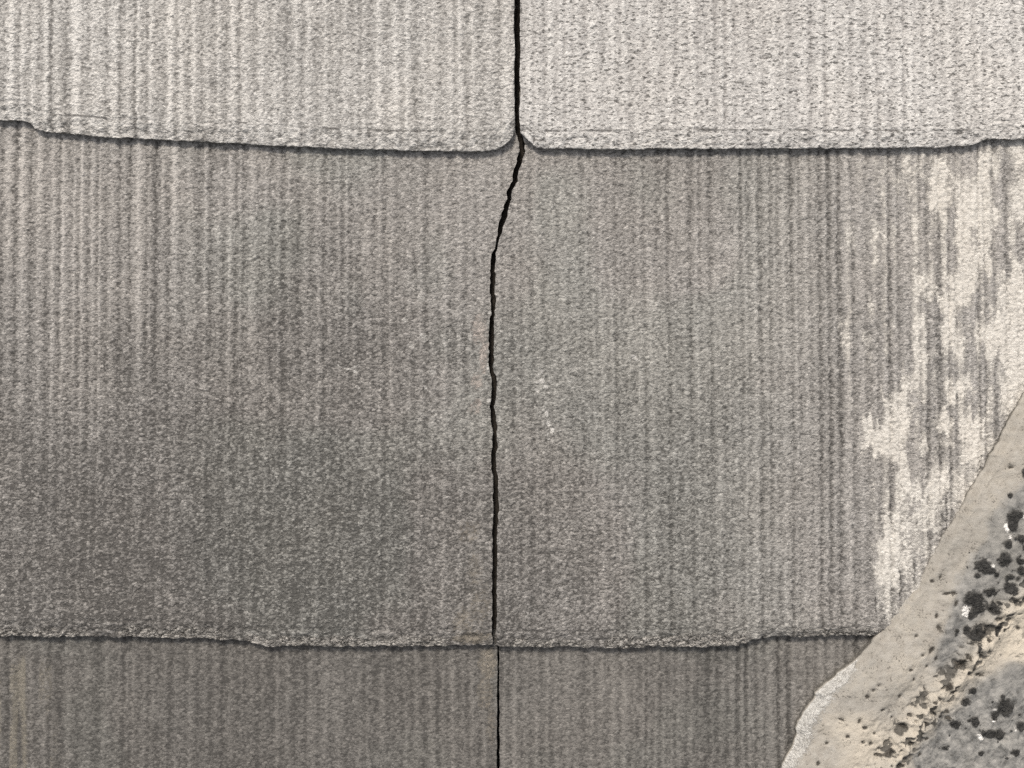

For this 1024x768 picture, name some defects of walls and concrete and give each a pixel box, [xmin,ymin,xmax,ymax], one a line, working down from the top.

crack [441,0,560,645]
peeling [792,139,1024,637]
spalling [858,719,905,767]
spalling [955,654,984,676]